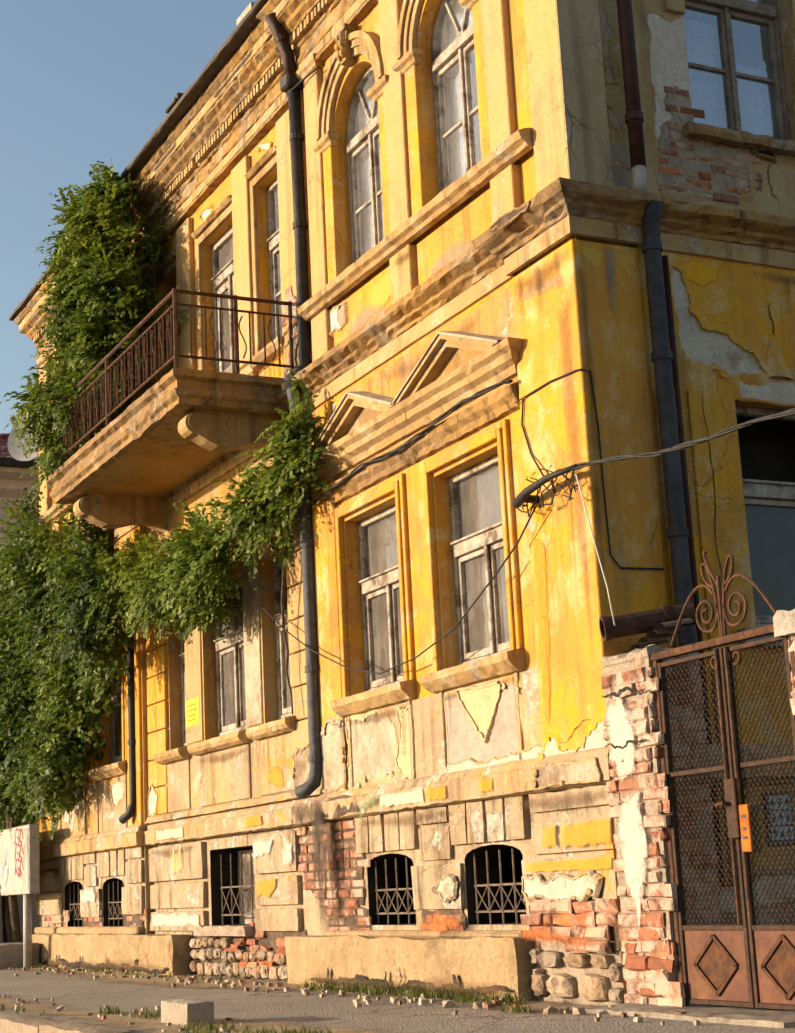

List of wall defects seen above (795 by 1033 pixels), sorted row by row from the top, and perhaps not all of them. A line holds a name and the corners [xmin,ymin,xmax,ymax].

flaking render [642,8,762,206]
peeling [668,260,773,386]
peeling [444,680,635,791]
flaking render [42,909,70,927]
flaking render [80,888,104,927]
peeling [253,710,400,931]
flaking render [520,792,675,973]
spalling [640,988,664,998]